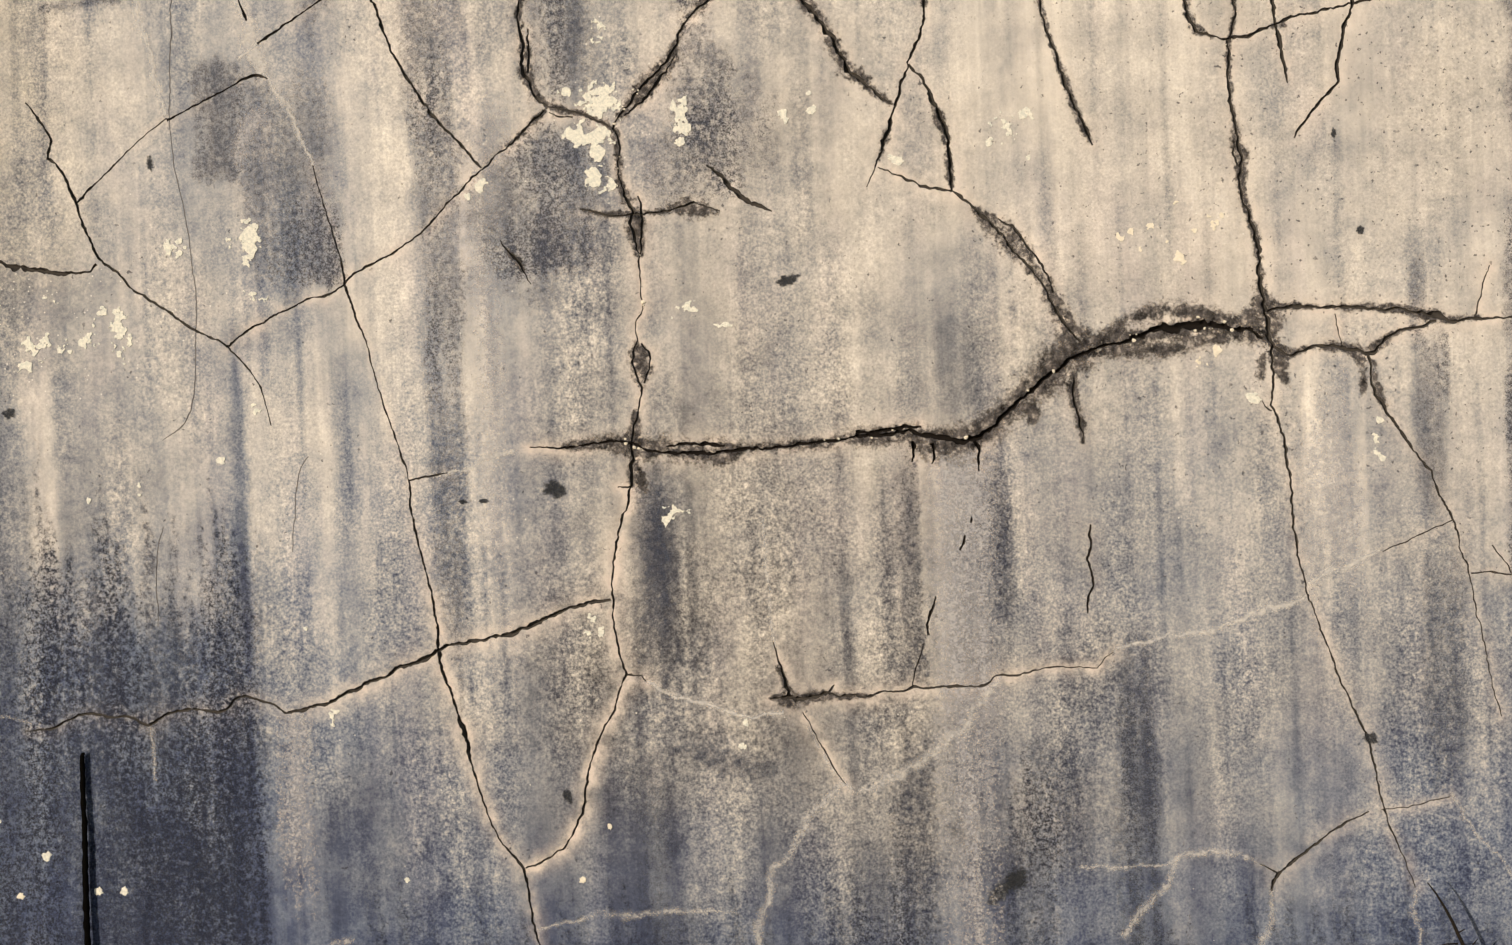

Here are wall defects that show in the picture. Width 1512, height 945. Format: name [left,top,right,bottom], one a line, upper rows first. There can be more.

crack [0,260,97,276]
damp [193,60,340,287]
crack [25,0,650,945]
damp [402,0,601,647]
peeling [557,80,624,194]
peeling [590,17,606,44]
peeling [670,95,691,147]
crack [346,0,1512,735]
damp [0,493,315,945]
damp [808,447,1086,945]
crack [1259,811,1369,891]
crack [1367,741,1449,888]